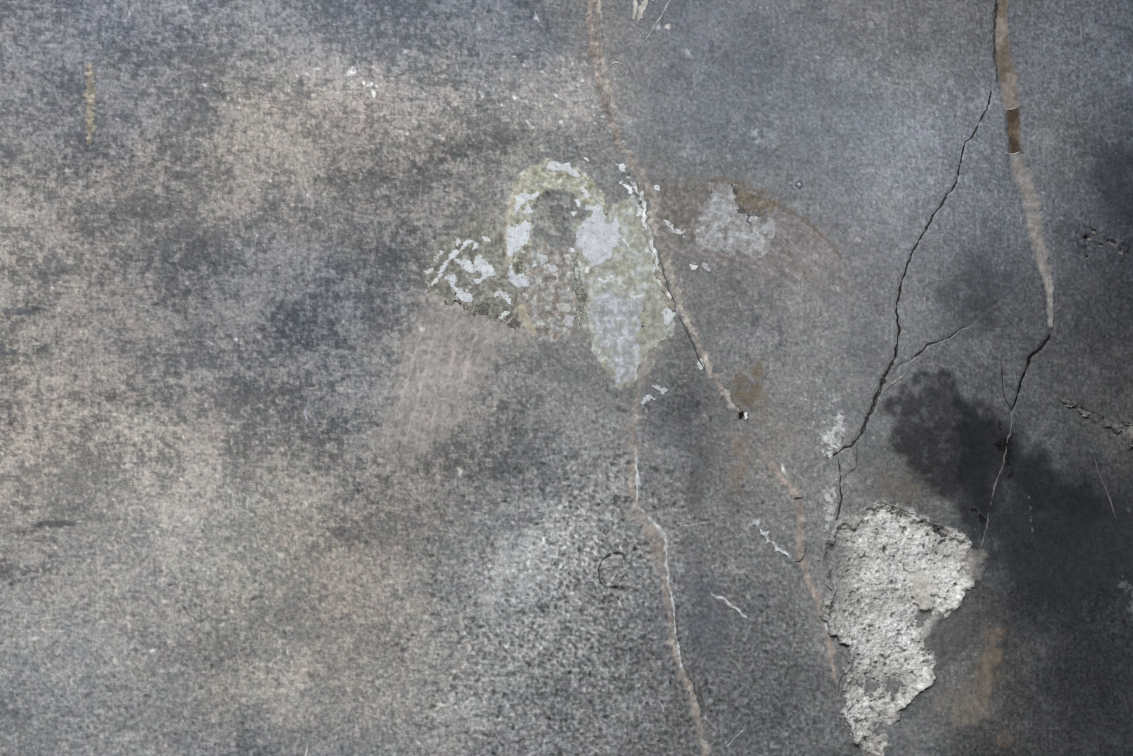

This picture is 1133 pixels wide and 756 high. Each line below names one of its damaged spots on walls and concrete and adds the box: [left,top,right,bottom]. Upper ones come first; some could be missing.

peeling [422,191,559,320]
peeling [556,301,575,327]
peeling [546,157,630,285]
peeling [615,163,643,217]
peeling [640,384,672,405]
crack [581,0,740,756]
peeling [661,307,678,326]
peeling [663,219,686,238]
peeling [688,262,711,272]
crack [747,0,1055,696]
damp [875,366,1133,630]
spalling [817,499,990,756]